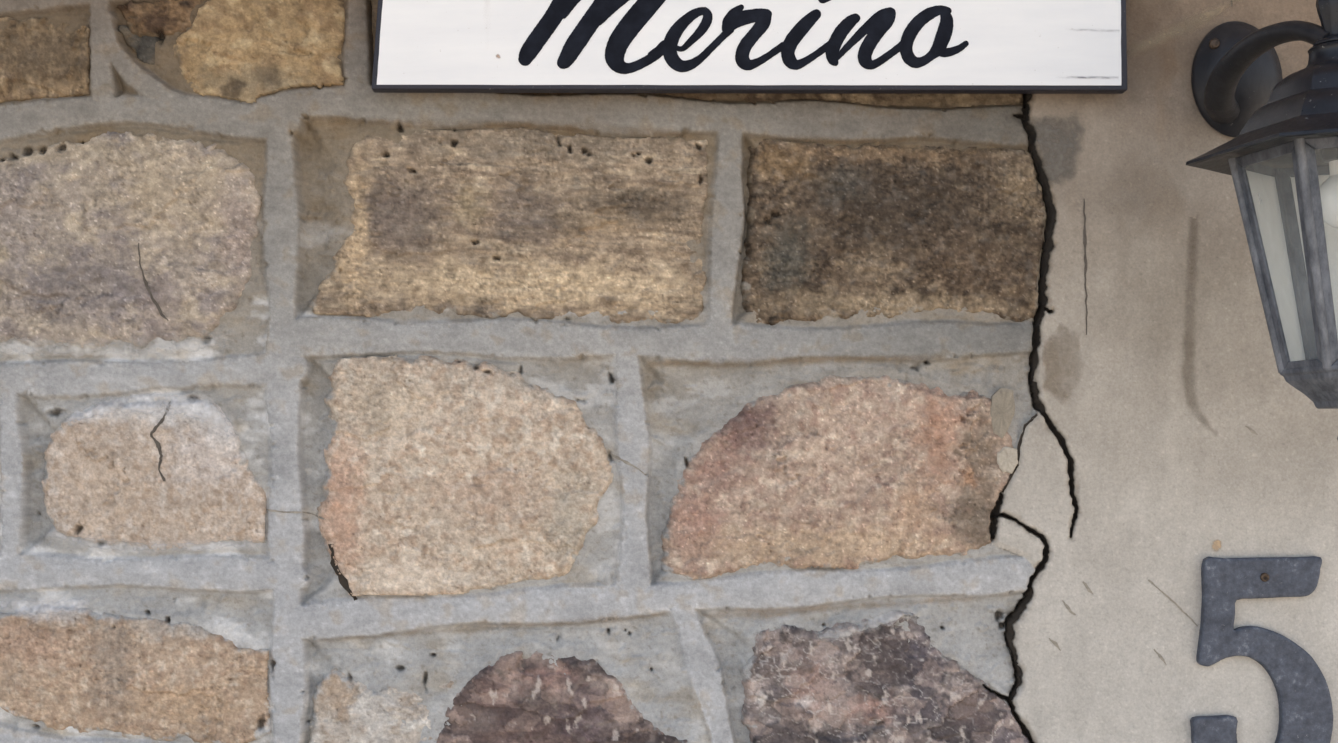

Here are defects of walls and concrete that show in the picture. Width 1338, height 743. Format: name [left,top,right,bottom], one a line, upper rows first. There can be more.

crack [150,401,171,481]
crack [983,94,1078,743]